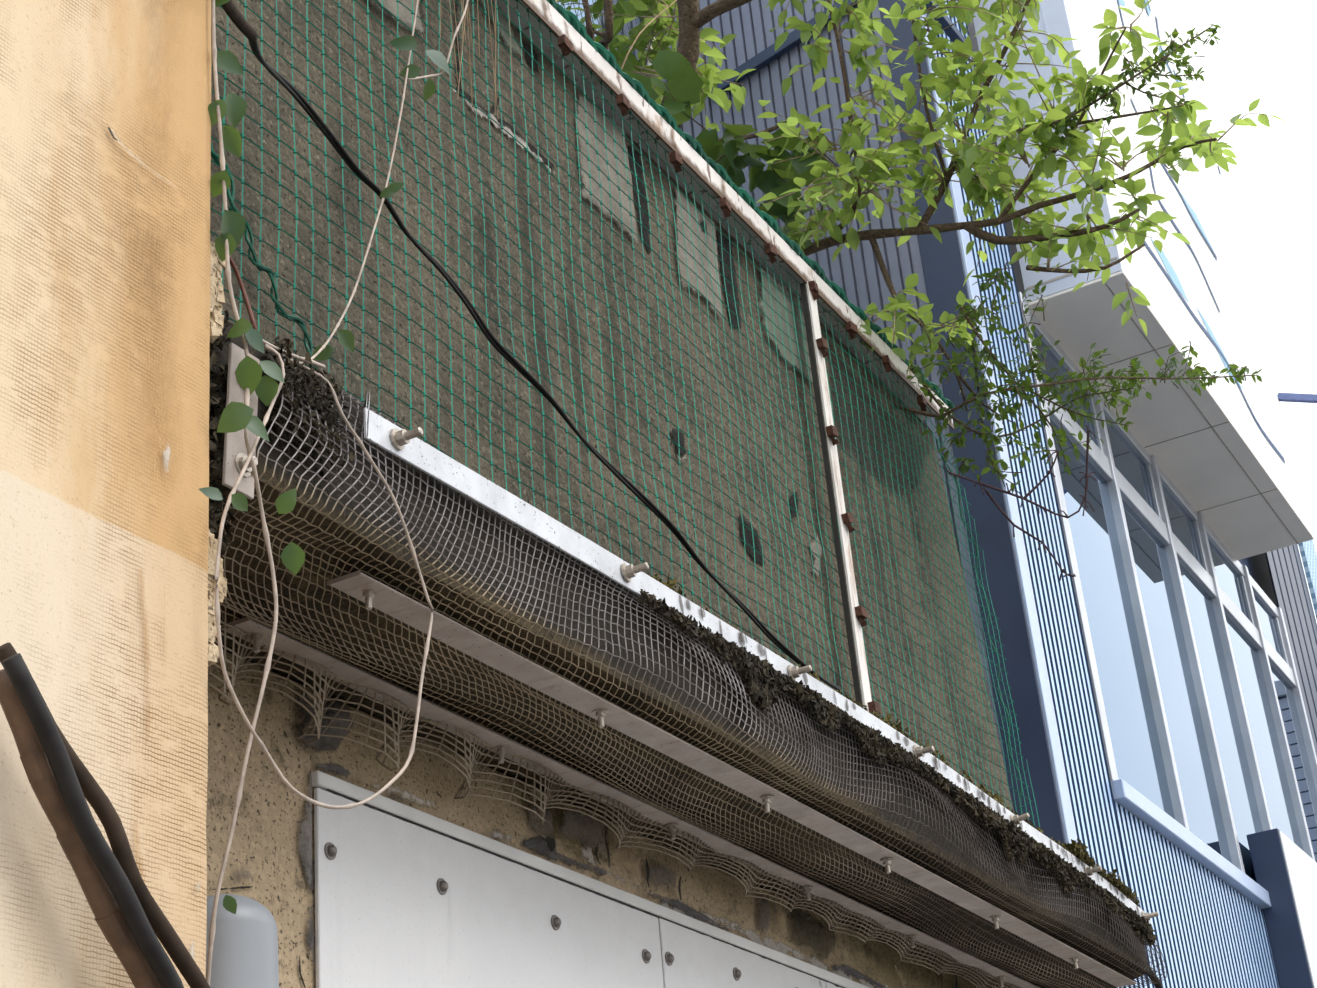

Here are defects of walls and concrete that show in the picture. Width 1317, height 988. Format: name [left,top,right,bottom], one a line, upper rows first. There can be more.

peeling [575,94,651,253]
peeling [675,187,741,329]
peeling [759,269,813,383]
spalling [758,896,836,959]